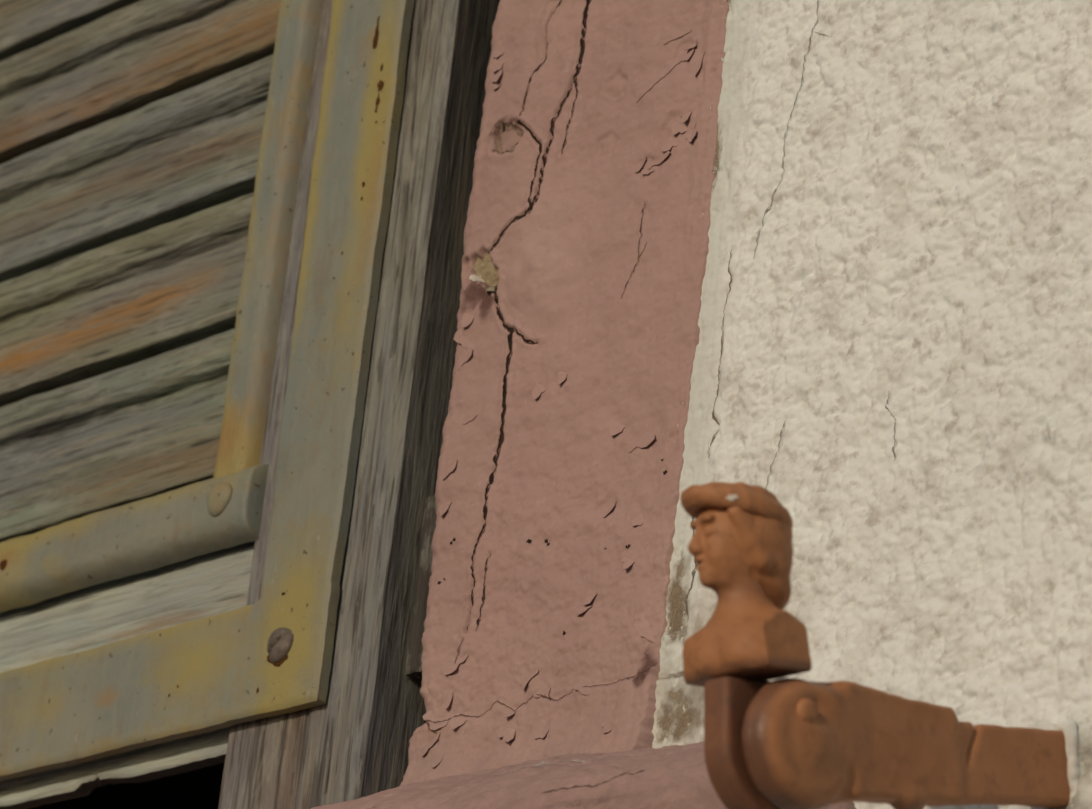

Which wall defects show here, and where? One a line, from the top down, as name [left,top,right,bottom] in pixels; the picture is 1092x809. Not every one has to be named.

spalling [491,119,523,153]
crack [490,0,589,252]
spalling [469,252,499,293]
peeling [453,310,475,367]
crack [455,286,538,664]
peeling [422,692,469,768]
crack [426,670,646,733]